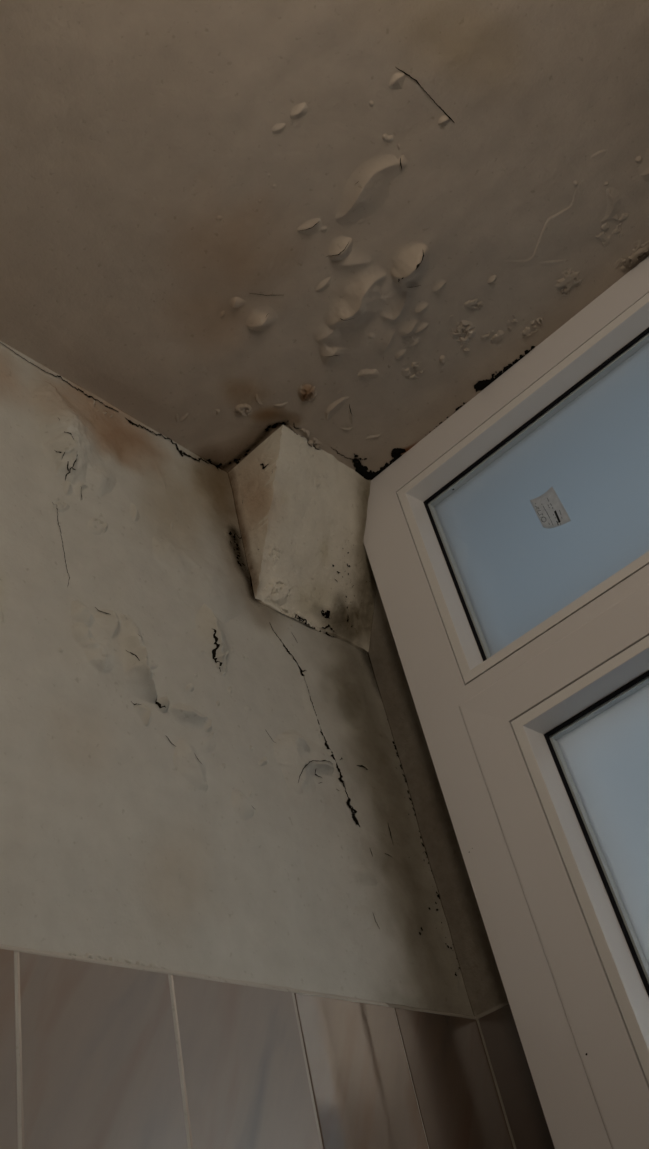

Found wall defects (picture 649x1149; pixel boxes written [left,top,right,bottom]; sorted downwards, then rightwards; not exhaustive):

crack [258,601,393,856]